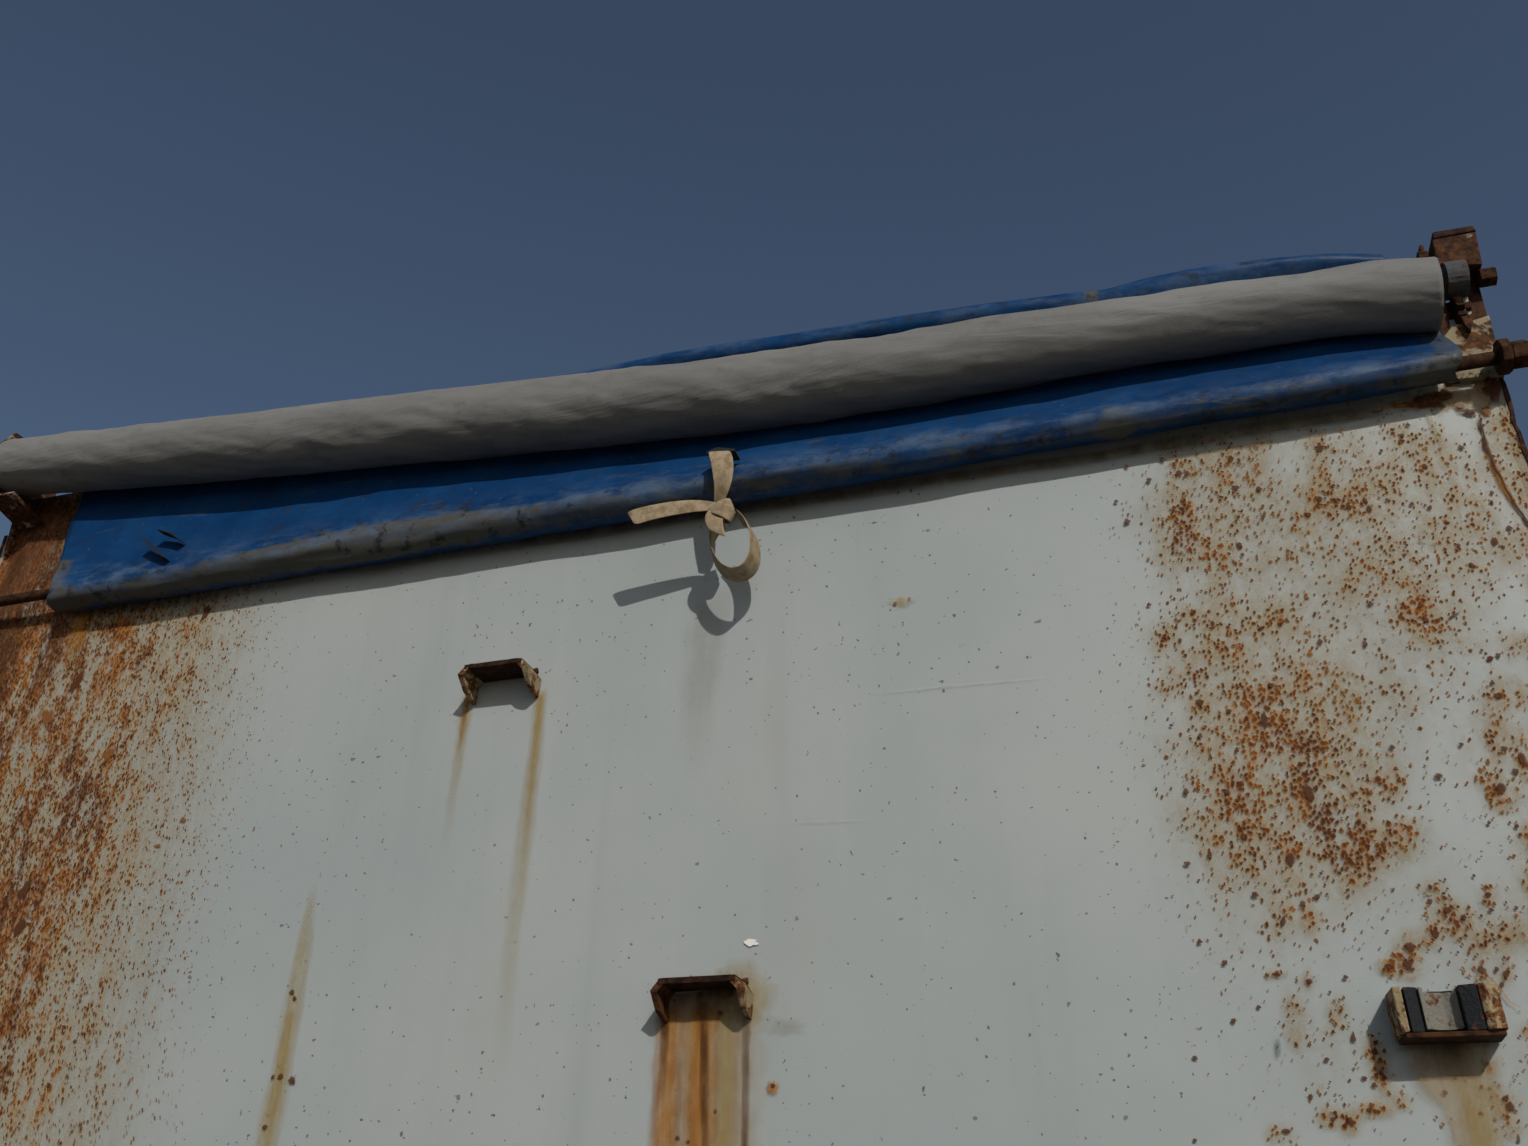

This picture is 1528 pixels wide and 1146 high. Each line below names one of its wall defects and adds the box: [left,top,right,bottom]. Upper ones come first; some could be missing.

corrosion [0,492,293,1146]
corrosion [655,989,746,1146]
corrosion [1107,377,1528,1146]